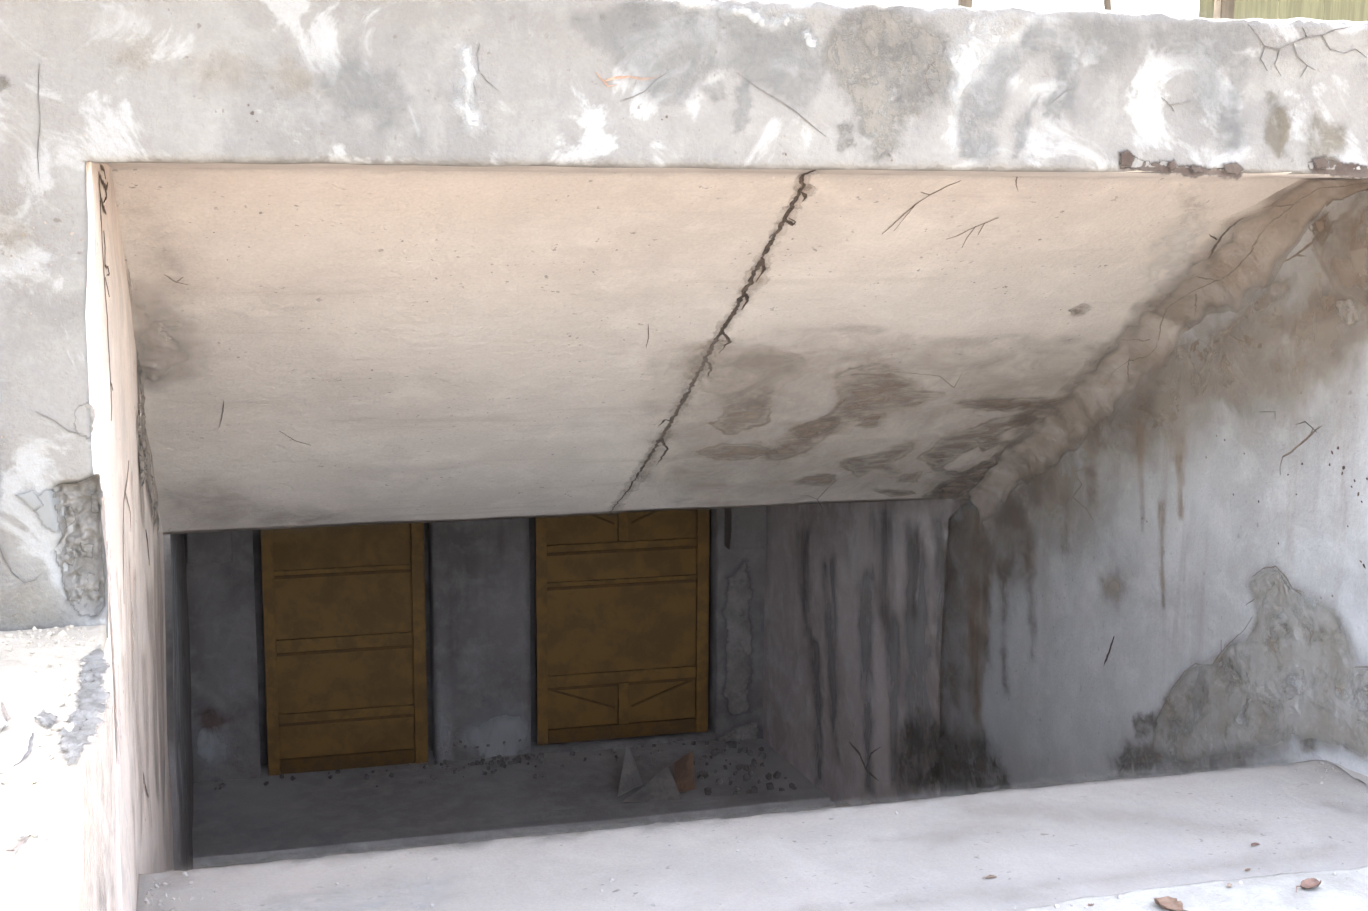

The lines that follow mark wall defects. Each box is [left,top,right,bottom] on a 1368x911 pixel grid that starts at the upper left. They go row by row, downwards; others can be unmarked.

crack [736,72,825,136]
spalling [1120,150,1244,179]
crack [1248,24,1367,77]
spalling [1308,156,1368,179]
crack [99,165,113,421]
crack [609,170,816,515]
water stain [696,368,928,459]
water stain [801,399,1058,499]
water stain [888,206,1368,793]
spalling [16,473,122,780]
water stain [812,562,837,728]
peeling [1153,571,1368,763]